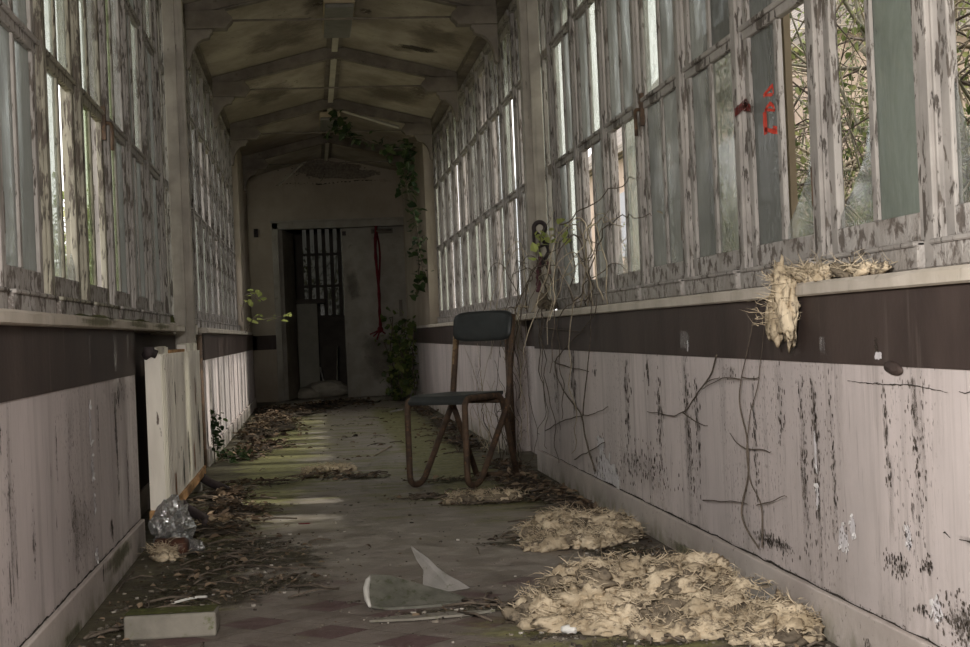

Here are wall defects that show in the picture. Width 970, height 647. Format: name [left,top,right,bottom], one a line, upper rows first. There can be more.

damp [621,360,701,511]
damp [748,378,838,565]
damp [881,379,891,488]
damp [883,376,938,581]
crack [852,381,970,394]
damp [913,588,970,647]